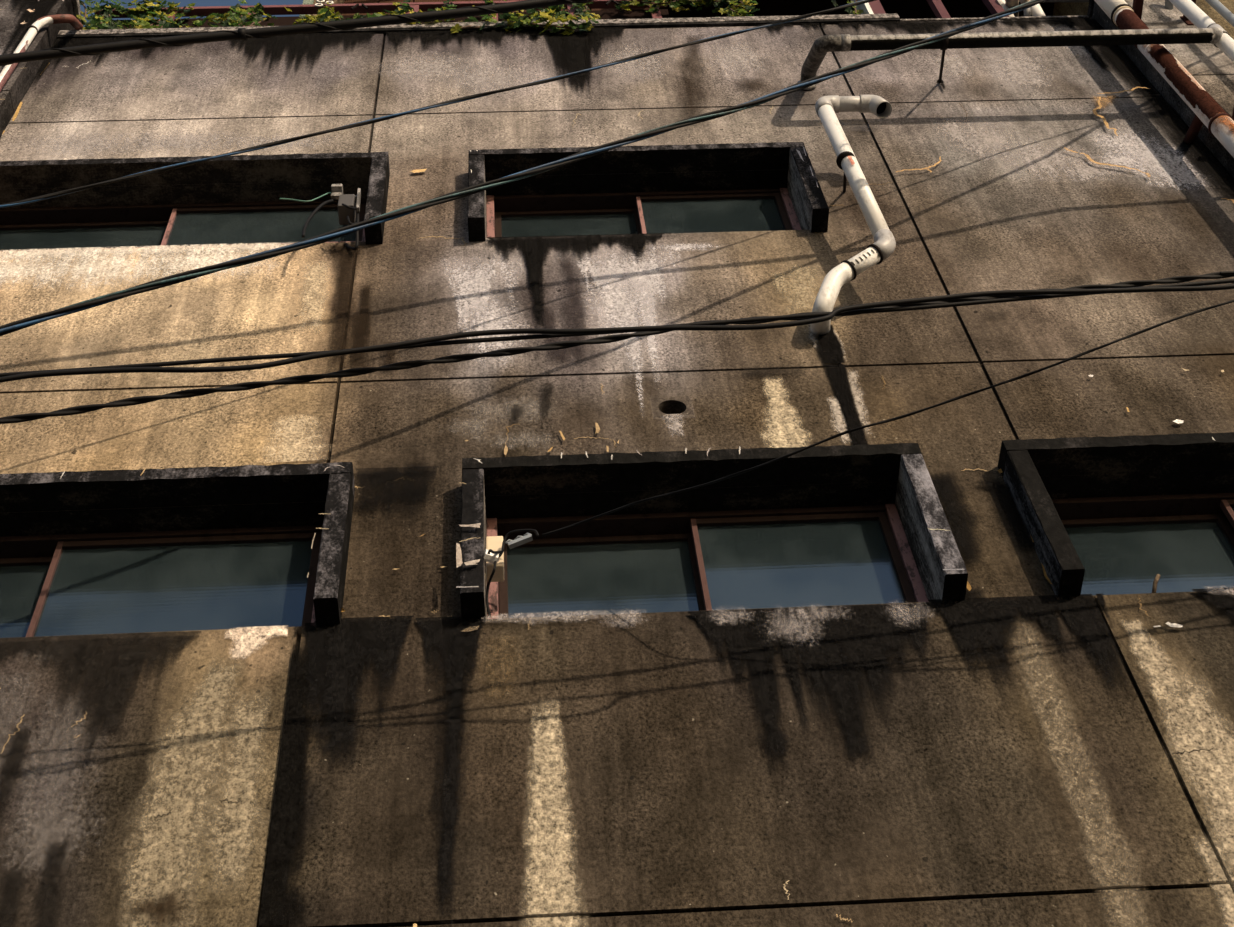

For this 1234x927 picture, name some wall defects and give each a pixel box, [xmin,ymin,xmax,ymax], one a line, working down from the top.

leakage [231,27,660,90]
crack [877,156,942,185]
leakage [757,17,1234,196]
crack [1064,147,1151,177]
crack [1092,87,1151,136]
leakage [449,233,717,404]
leakage [746,367,805,448]
leakage [809,325,868,445]
leakage [930,473,980,563]
leakage [0,631,201,749]
leakage [130,615,502,927]
leakage [688,587,1234,927]